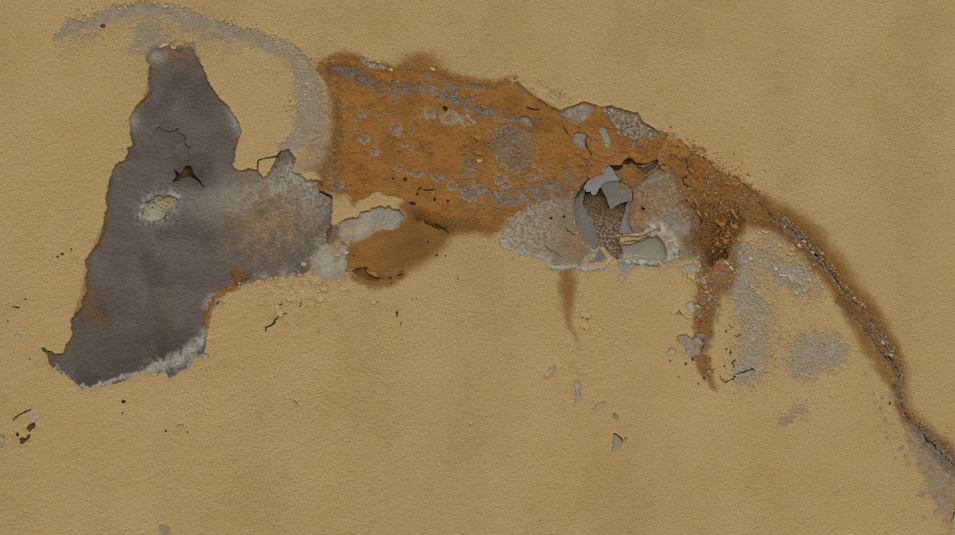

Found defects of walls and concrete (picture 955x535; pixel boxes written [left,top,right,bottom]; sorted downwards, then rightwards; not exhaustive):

peeling [42,43,404,389]
peeling [500,163,698,282]
corrosion [304,50,904,386]
peeling [558,102,662,162]
crack [761,205,955,476]